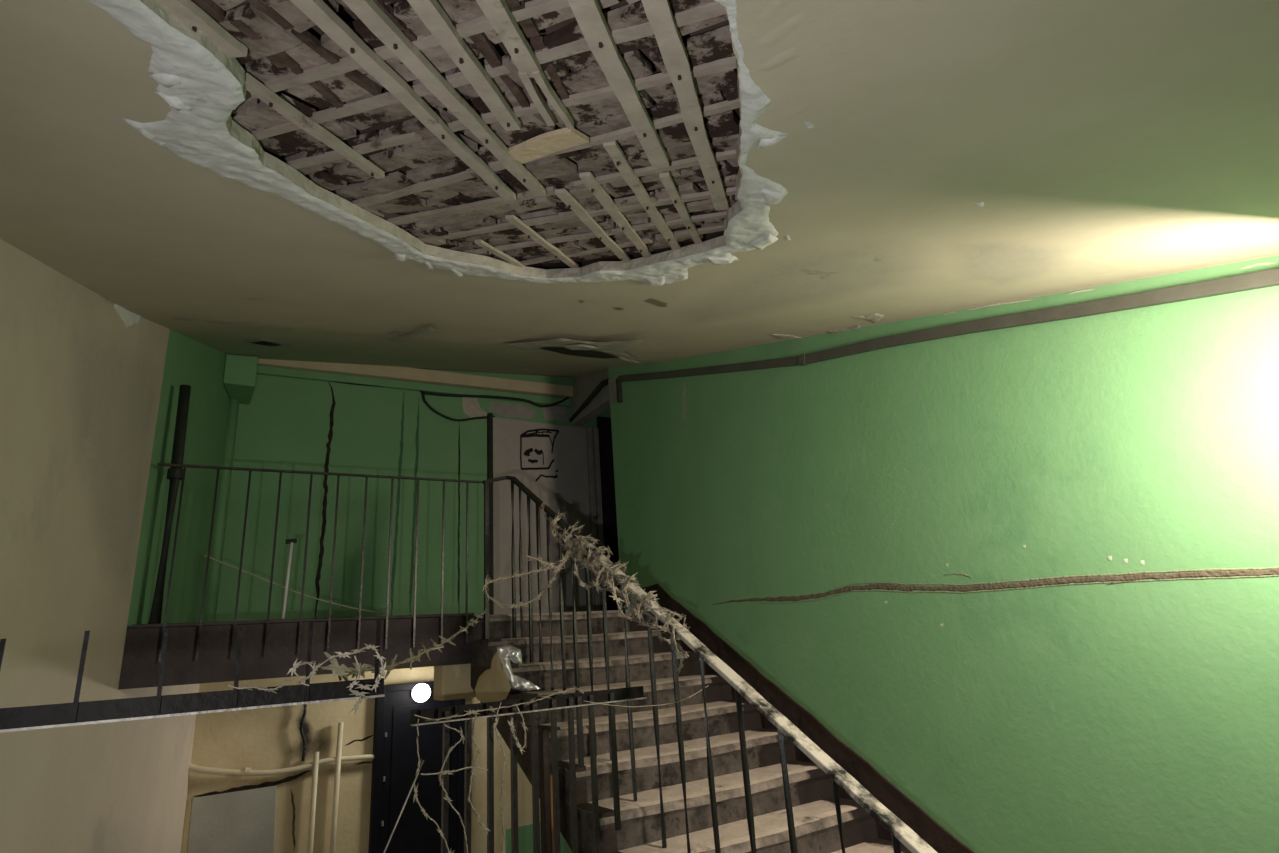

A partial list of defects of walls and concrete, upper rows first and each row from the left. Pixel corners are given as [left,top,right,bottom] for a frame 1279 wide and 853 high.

flaking render [86,0,791,286]
crack [315,382,336,618]
crack [712,566,1279,605]
crack [345,735,373,765]
crack [193,770,311,849]